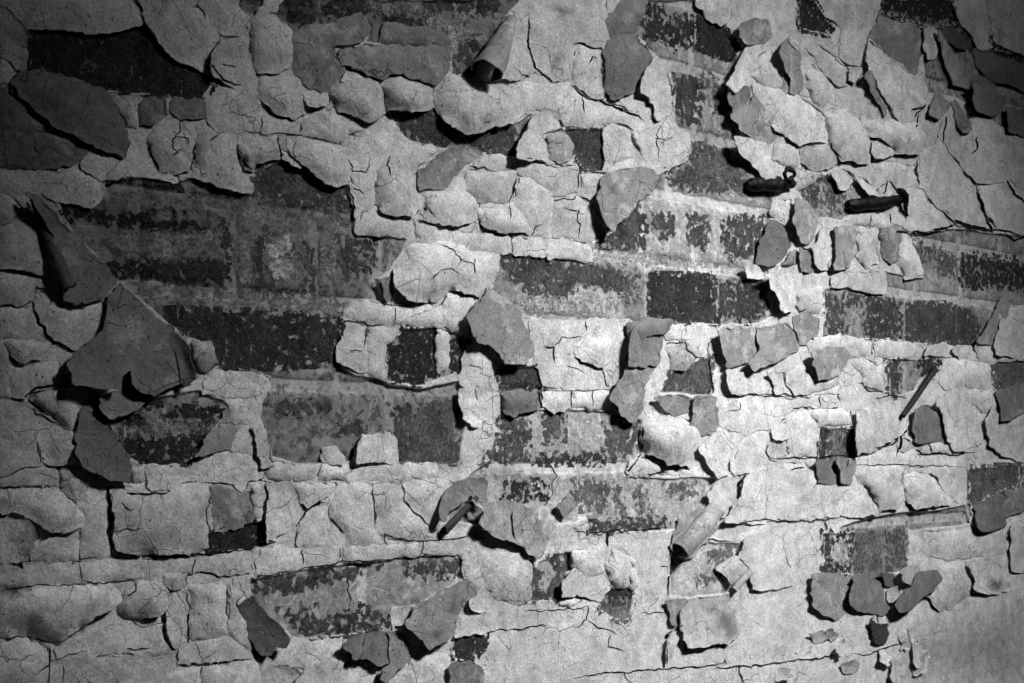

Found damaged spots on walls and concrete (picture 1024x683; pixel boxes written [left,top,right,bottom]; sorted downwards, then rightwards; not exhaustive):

crack [509,158,581,237]
crack [574,50,673,162]
peeling [720,0,1024,293]
crack [863,142,1024,242]
flaking render [0,0,794,596]
crack [537,321,608,407]
peeling [654,271,1024,644]
crack [1,488,515,605]
peeling [0,581,518,683]
peeling [531,544,640,624]
peeling [665,594,741,665]
crack [511,527,909,683]